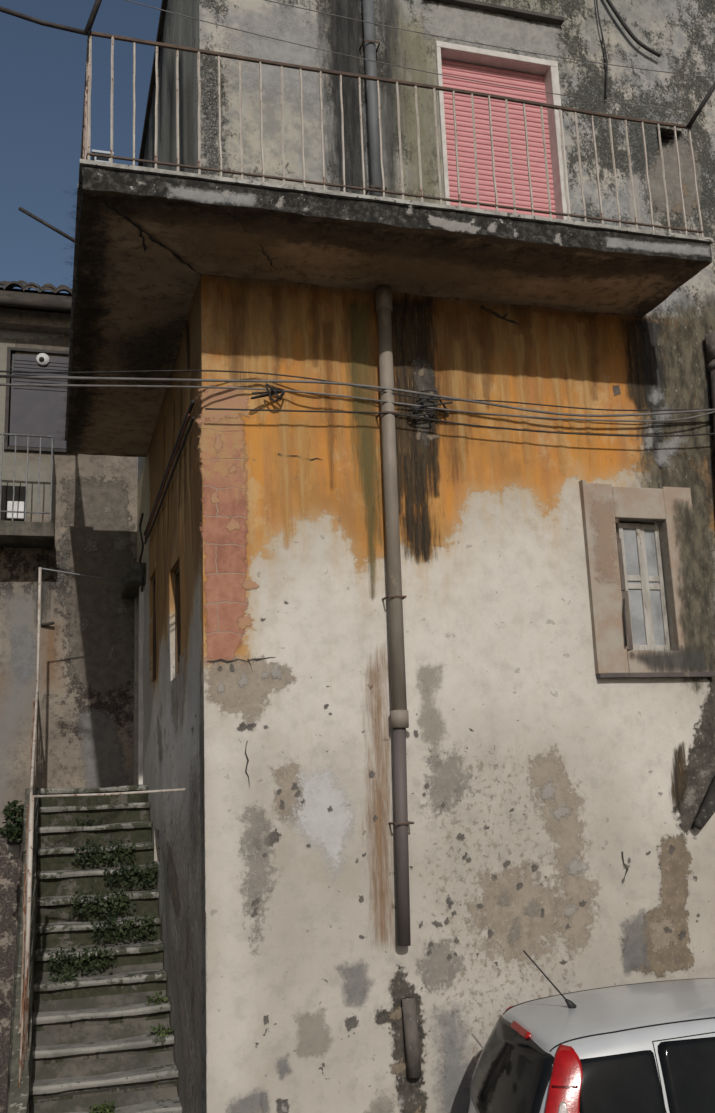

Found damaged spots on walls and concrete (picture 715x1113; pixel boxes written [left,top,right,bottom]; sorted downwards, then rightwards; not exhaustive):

water stain [318,0,367,195]
water stain [379,0,405,198]
crack [101,200,201,276]
water stain [62,193,706,598]
water stain [37,555,51,617]
spalling [196,384,296,731]
water stain [79,709,129,788]
peeling [240,762,304,952]
spalling [345,1016,359,1031]
peeling [375,750,600,1113]
peeling [619,677,715,978]